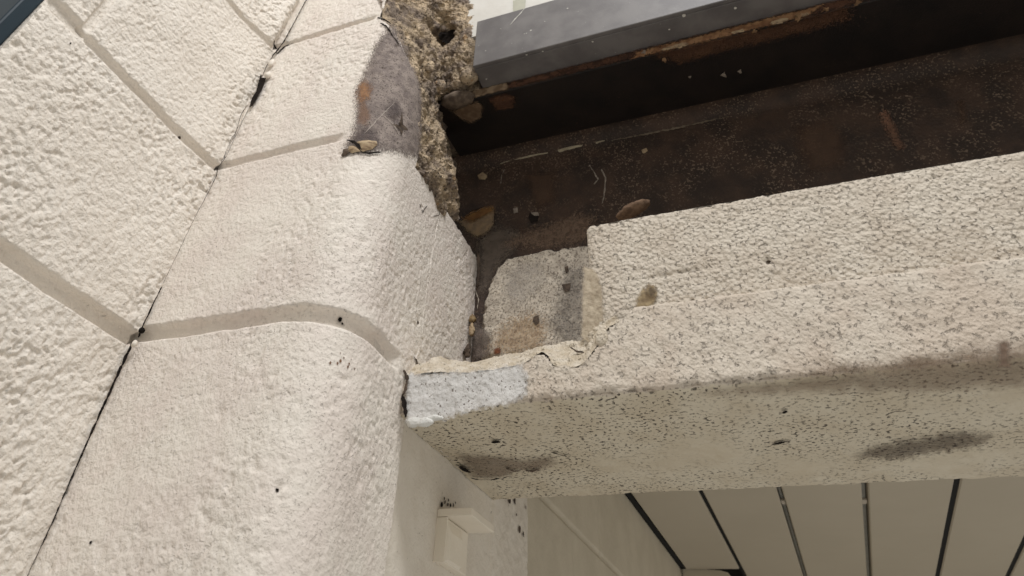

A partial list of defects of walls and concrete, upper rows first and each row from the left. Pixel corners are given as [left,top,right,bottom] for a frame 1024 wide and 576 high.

crack [256,0,307,77]
spalling [341,0,478,221]
rust [770,13,809,24]
crack [27,107,248,576]